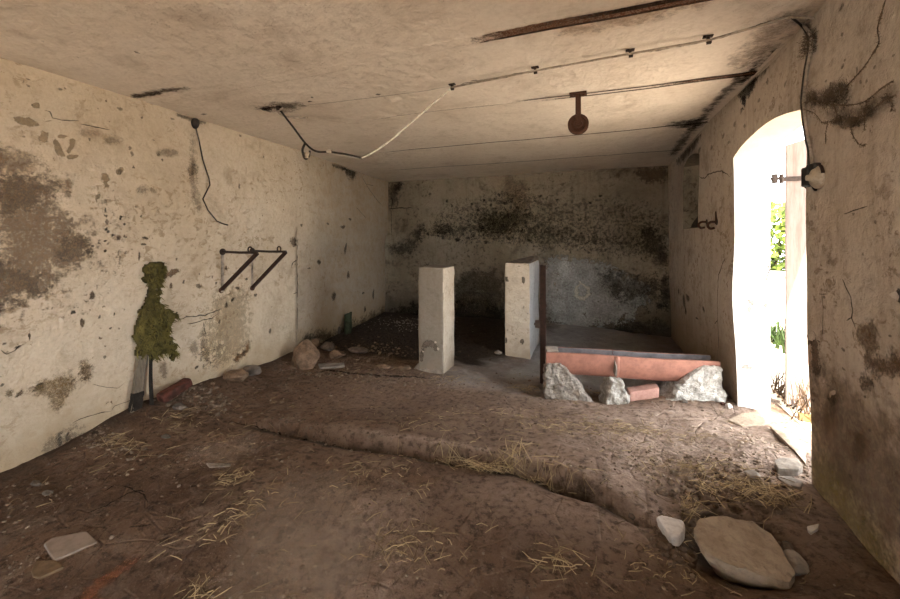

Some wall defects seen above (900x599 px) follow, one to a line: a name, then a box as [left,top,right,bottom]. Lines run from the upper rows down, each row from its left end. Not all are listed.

rust [475,0,711,43]
peeling [10,103,78,159]
damp [131,87,189,98]
damp [262,102,303,113]
damp [0,147,129,315]
damp [390,189,670,335]
damp [35,360,92,410]
damp [811,319,900,540]